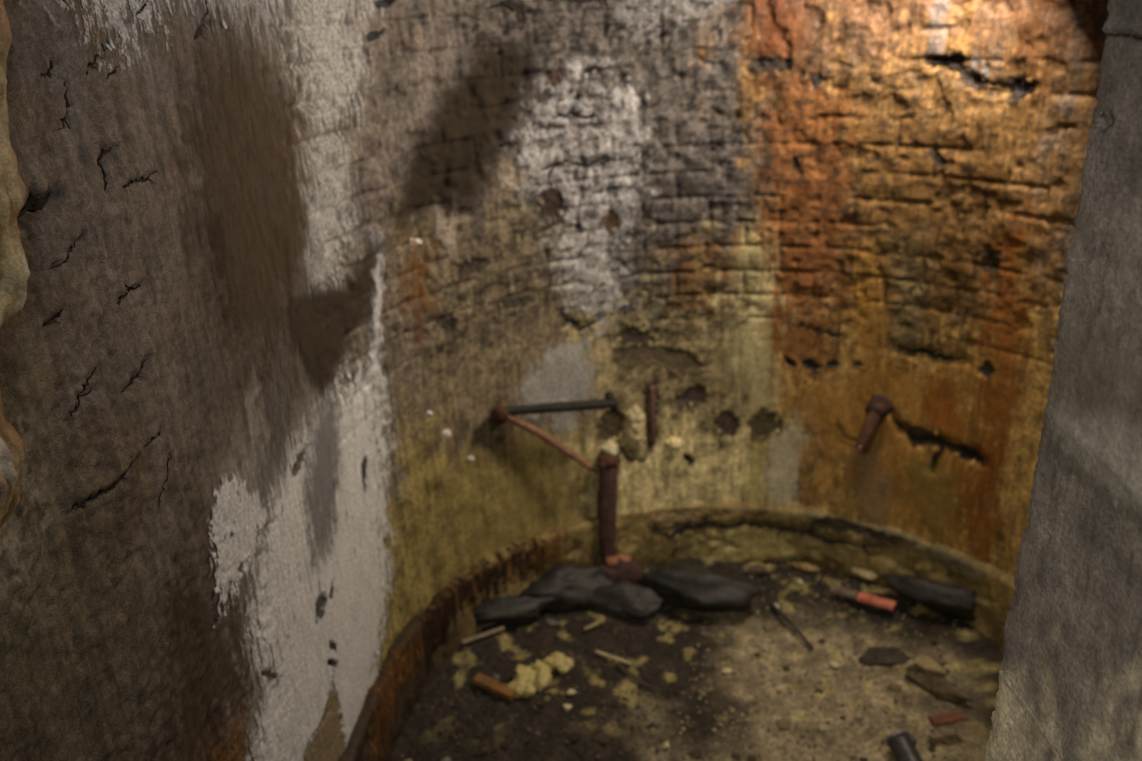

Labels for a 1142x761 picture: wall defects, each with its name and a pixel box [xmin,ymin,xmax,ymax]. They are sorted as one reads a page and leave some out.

crack [42,54,119,130]
spalling [928,52,984,89]
crack [927,55,1037,91]
spalling [1005,74,1036,104]
crack [97,147,157,191]
crack [17,193,48,219]
crack [52,236,81,268]
crack [116,284,141,313]
damp [179,0,384,566]
crack [43,308,63,326]
crack [645,516,893,565]
corrosion [605,554,631,567]